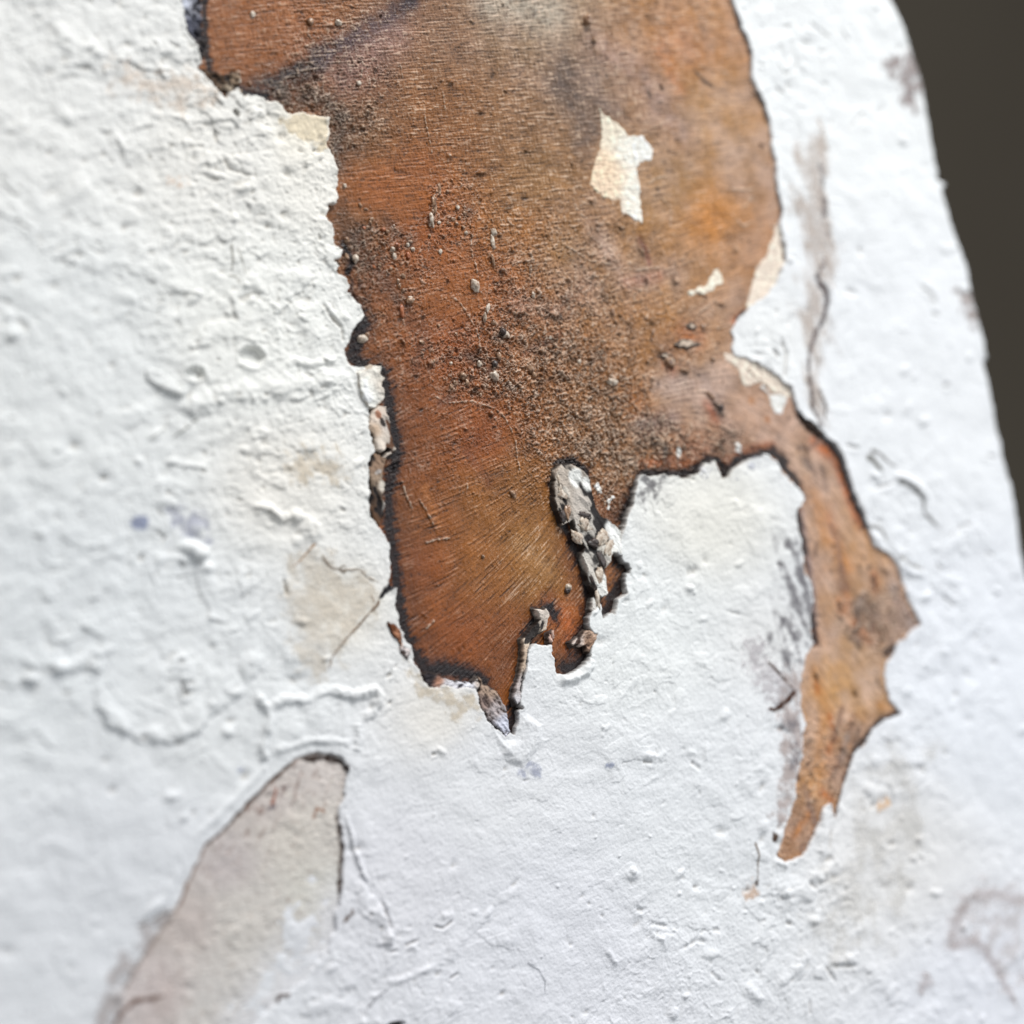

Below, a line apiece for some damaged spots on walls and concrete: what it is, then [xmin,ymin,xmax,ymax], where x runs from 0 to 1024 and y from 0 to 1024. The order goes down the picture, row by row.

spalling [181,0,920,862]
crack [807,163,830,427]
peeling [114,752,354,1024]